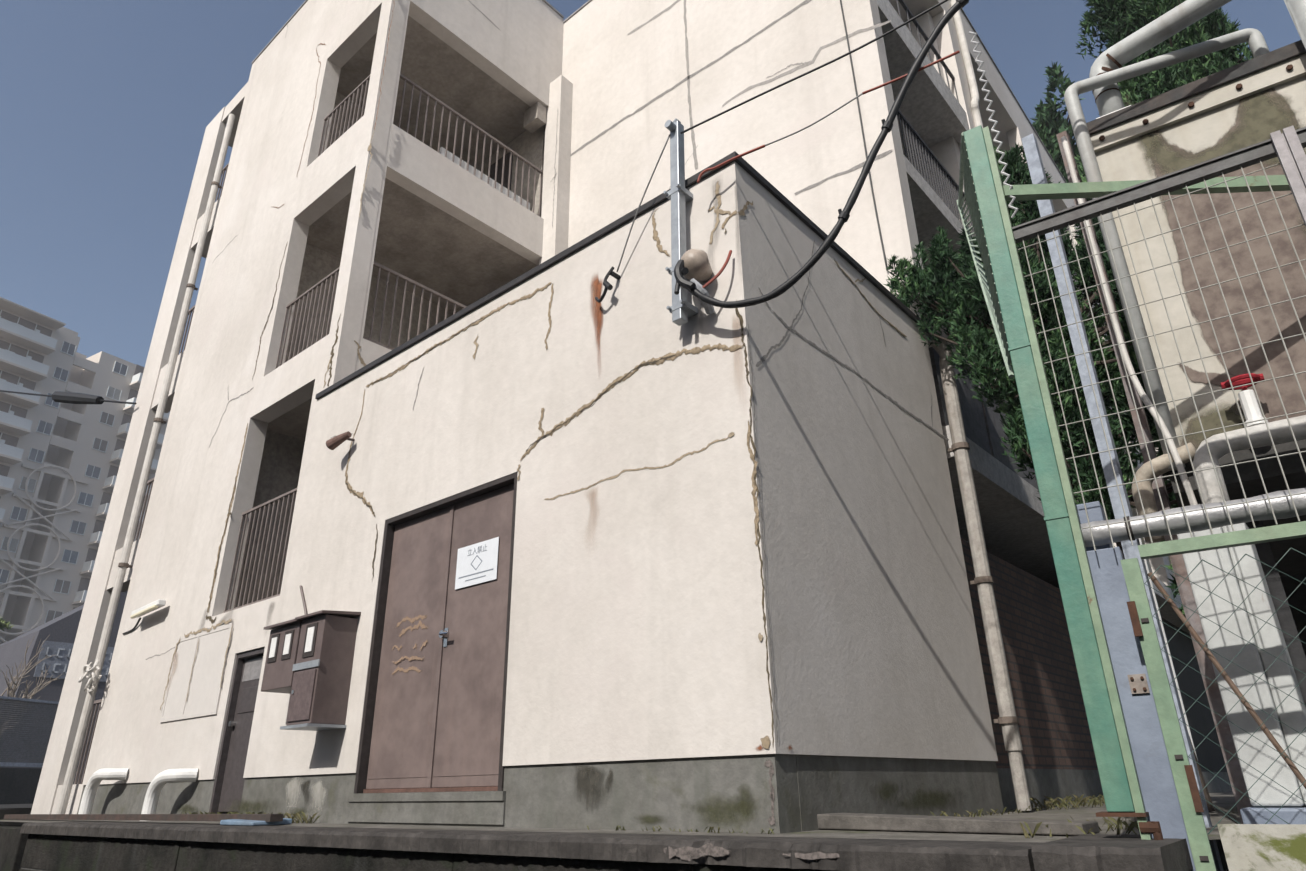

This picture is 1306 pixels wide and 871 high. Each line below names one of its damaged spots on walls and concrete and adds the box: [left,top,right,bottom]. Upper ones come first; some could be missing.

crack [297,43,325,174]
crack [552,0,892,256]
rust [591,277,602,342]
crack [202,244,287,631]
crack [323,282,554,578]
crack [517,241,949,826]
water stain [578,766,613,804]
spalling [664,842,730,861]
spalling [782,852,839,860]